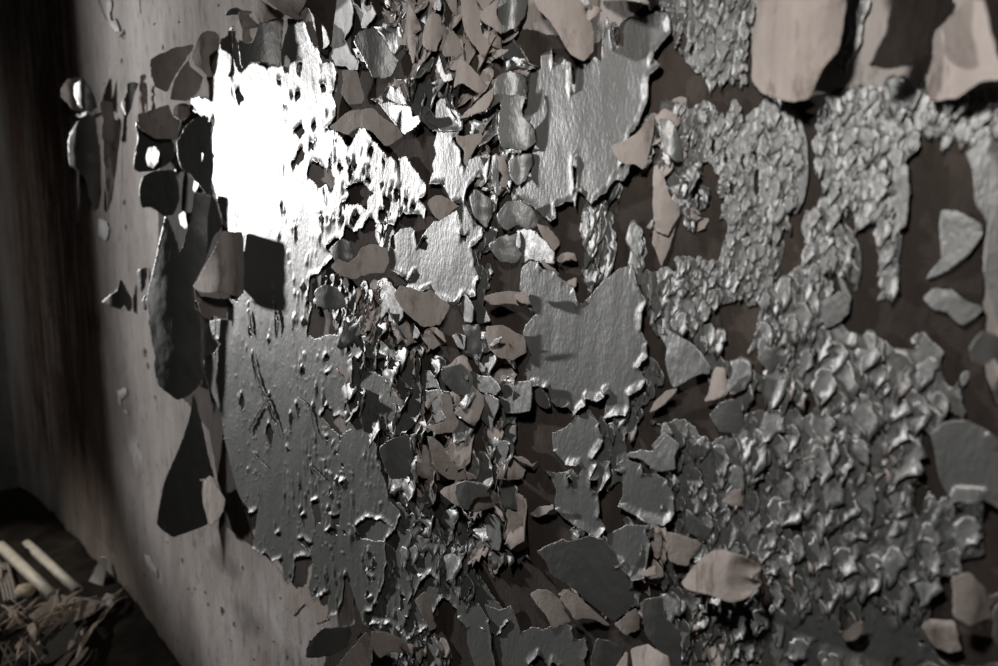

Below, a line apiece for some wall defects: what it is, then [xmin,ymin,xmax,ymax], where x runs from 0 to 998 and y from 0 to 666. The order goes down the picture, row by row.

peeling [61,77,120,224]
peeling [122,82,138,116]
peeling [102,280,132,311]
peeling [134,0,588,666]
peeling [330,0,998,666]